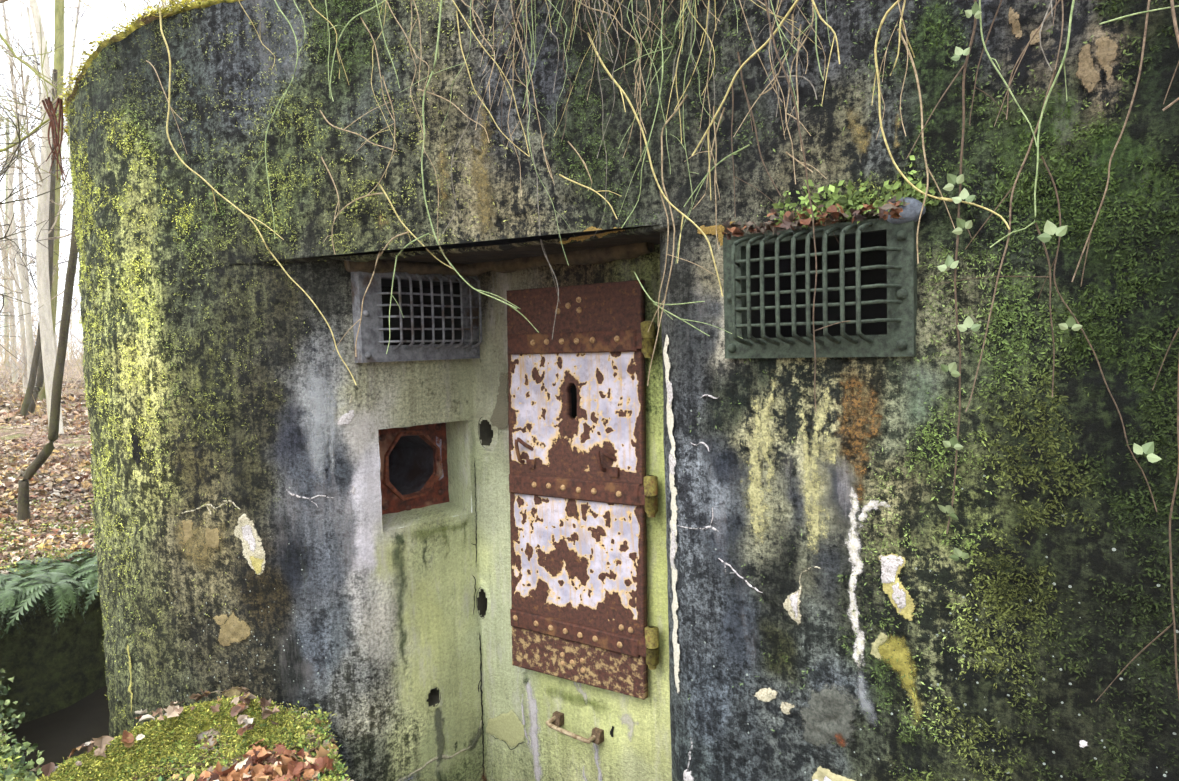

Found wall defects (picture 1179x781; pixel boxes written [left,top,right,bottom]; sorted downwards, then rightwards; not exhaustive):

peeling [1008,7,1042,45]
peeling [1075,36,1118,93]
damp [310,377,335,467]
rust [838,368,882,504]
peeling [175,513,265,575]
crack [677,507,762,593]
spalling [783,566,820,624]
damp [847,489,888,662]
spalling [879,553,915,621]
spalling [213,611,251,646]
damp [859,679,872,713]